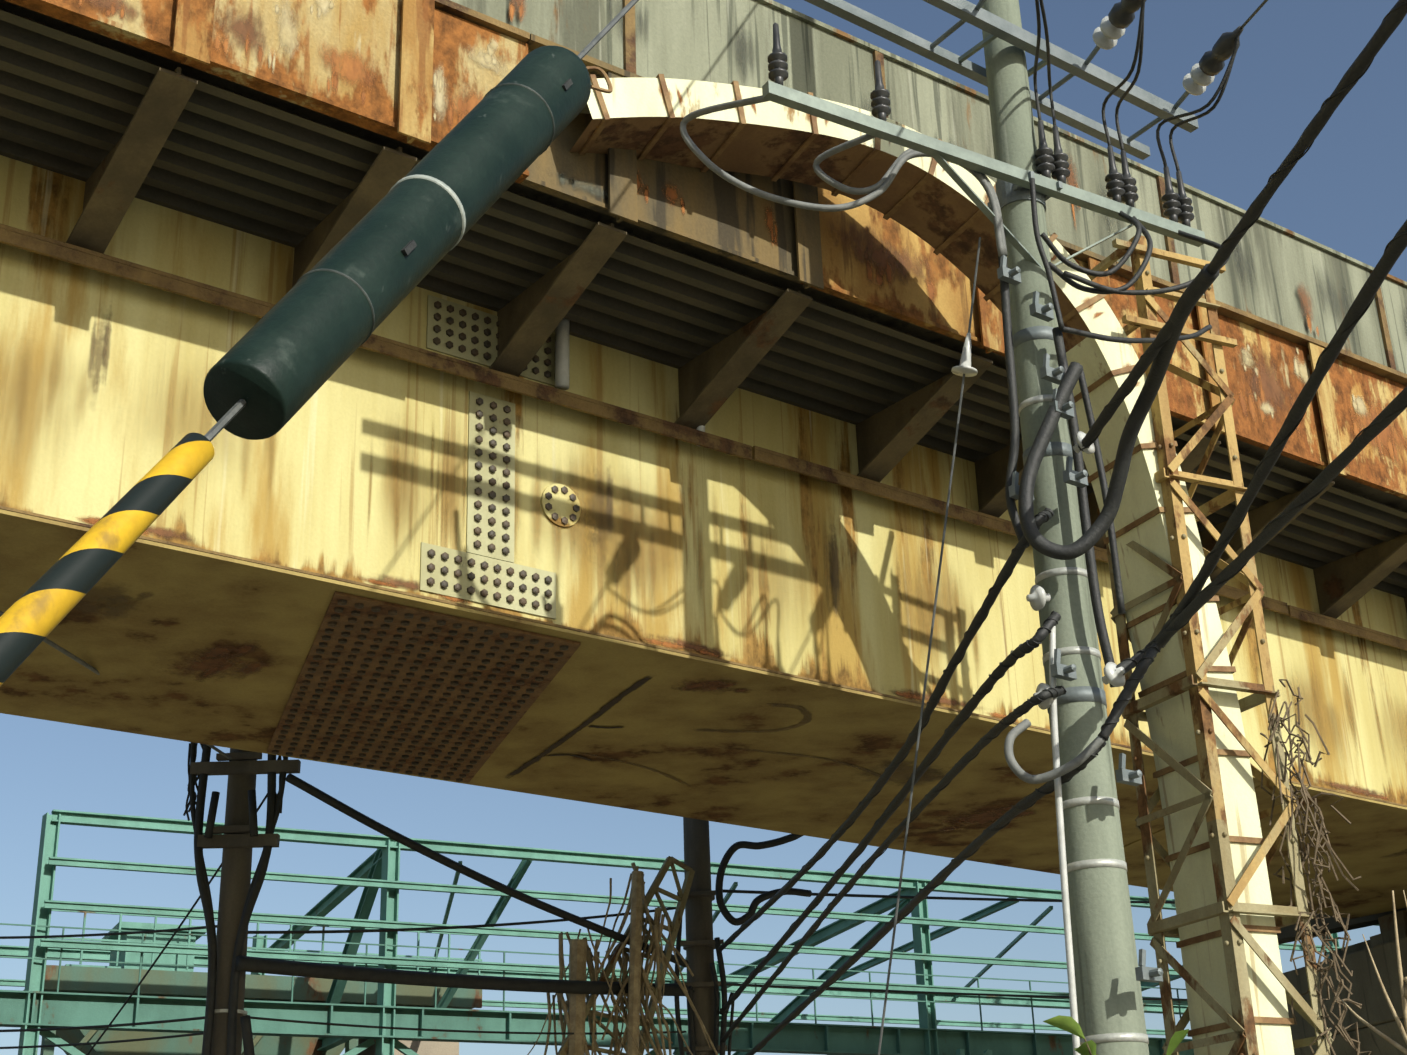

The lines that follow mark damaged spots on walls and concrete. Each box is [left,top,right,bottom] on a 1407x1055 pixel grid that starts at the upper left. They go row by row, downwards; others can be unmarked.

corrosion [79,0,135,18]
corrosion [509,0,525,19]
corrosion [215,14,265,64]
corrosion [324,49,372,104]
corrosion [841,223,934,302]
corrosion [1298,287,1319,336]
corrosion [1350,404,1407,464]
corrosion [143,527,190,540]
corrosion [648,639,720,657]
corrosion [895,690,966,707]
corrosion [1326,782,1387,800]